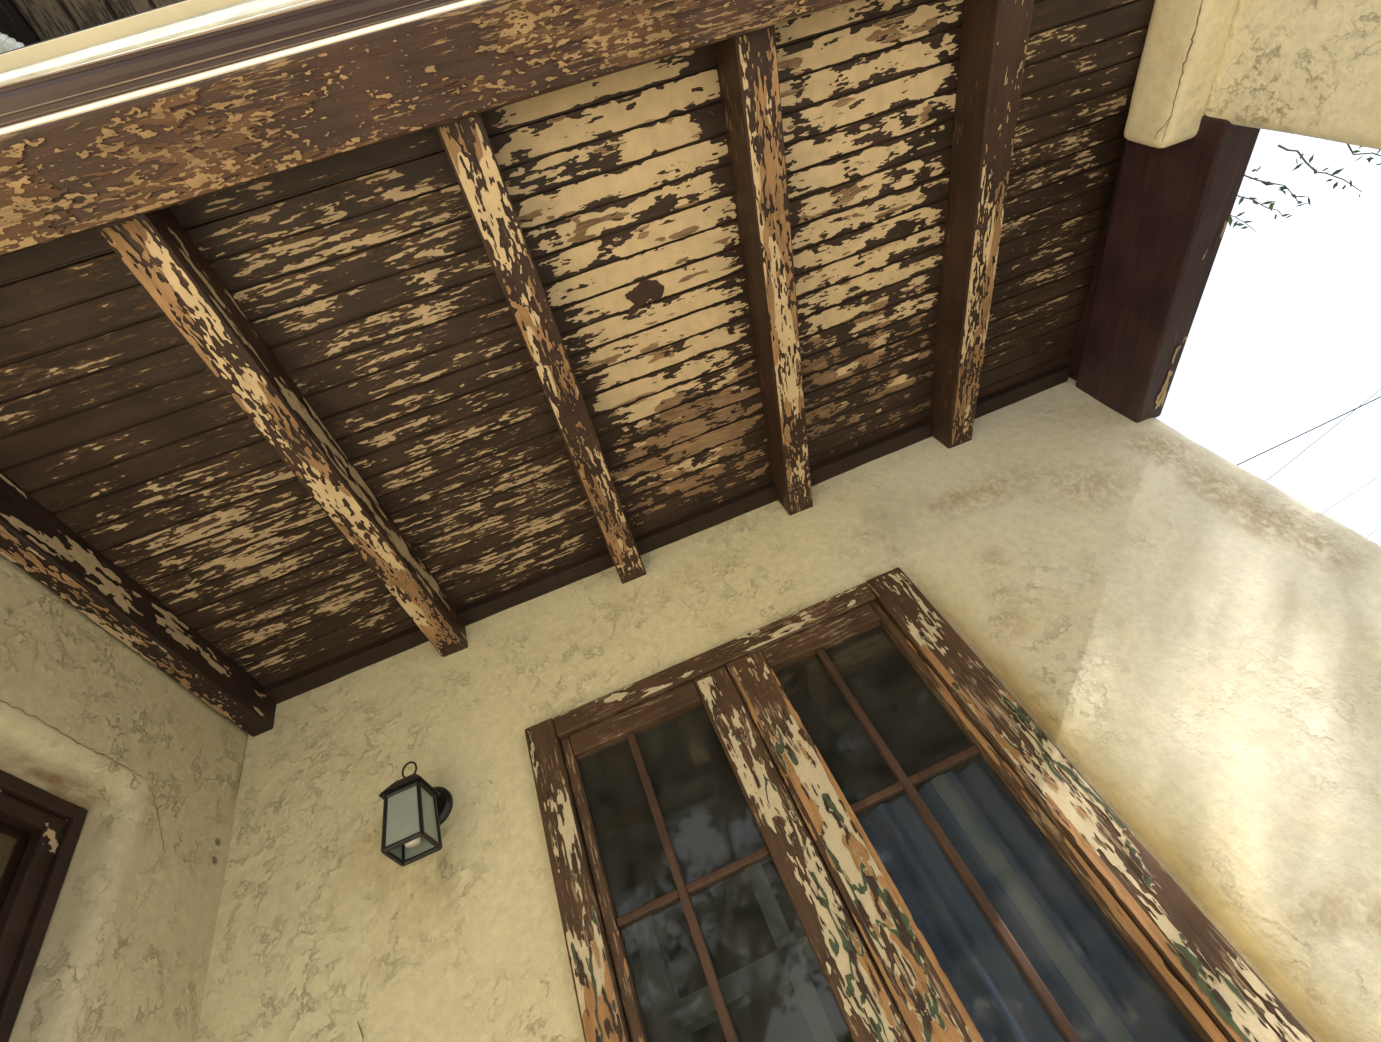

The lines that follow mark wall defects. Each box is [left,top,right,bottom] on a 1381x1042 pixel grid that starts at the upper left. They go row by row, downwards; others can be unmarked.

peeling [0,0,964,727]
peeling [952,0,1149,444]
peeling [1155,332,1187,409]
peeling [43,820,68,853]
peeling [526,731,643,1042]
peeling [560,611,984,1042]
peeling [826,573,1312,1042]